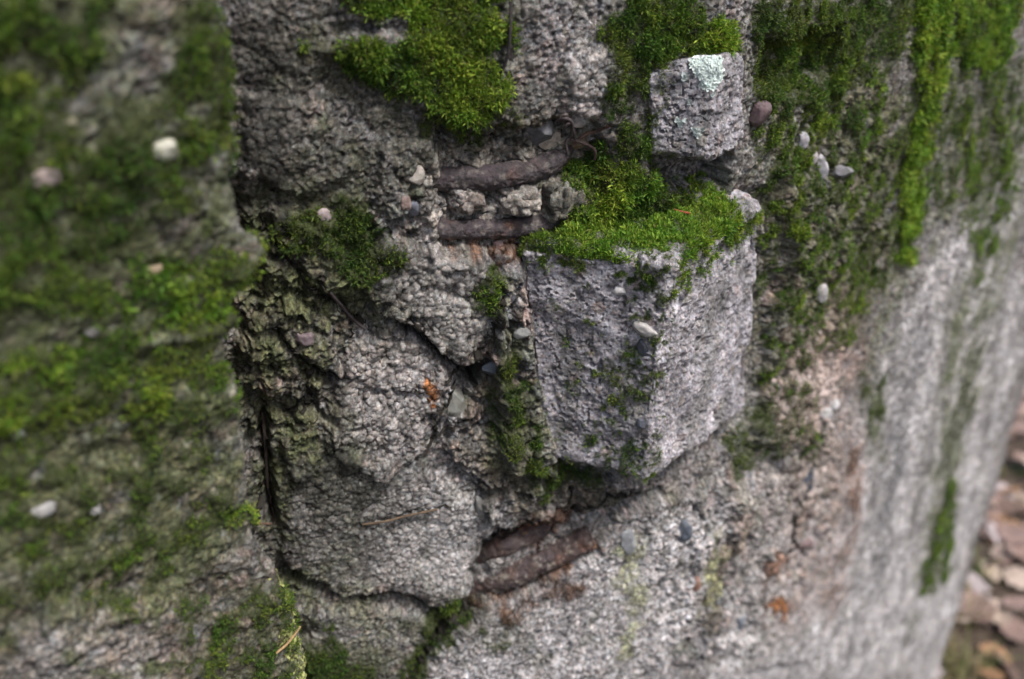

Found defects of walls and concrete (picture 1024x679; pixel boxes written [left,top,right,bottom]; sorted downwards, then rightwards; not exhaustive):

spalling [419,132,576,263]
crack [252,422,273,534]
spalling [462,511,604,612]
rust [538,562,584,600]